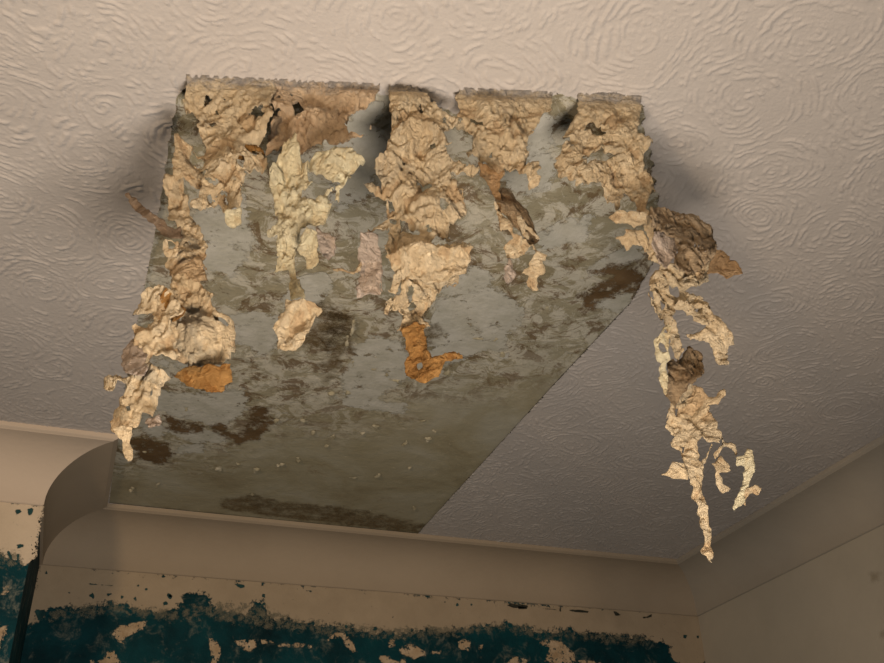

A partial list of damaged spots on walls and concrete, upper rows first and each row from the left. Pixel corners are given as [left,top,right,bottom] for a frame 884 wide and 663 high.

damp [577,259,645,311]
flaking render [104,74,761,563]
damp [303,302,353,379]
damp [163,406,275,445]
damp [130,437,176,465]
damp [223,495,424,532]
peeling [90,621,146,663]
peeling [209,638,221,663]
peeling [234,639,312,651]
peeling [328,632,355,652]
peeling [379,639,441,663]
peeling [541,639,600,663]